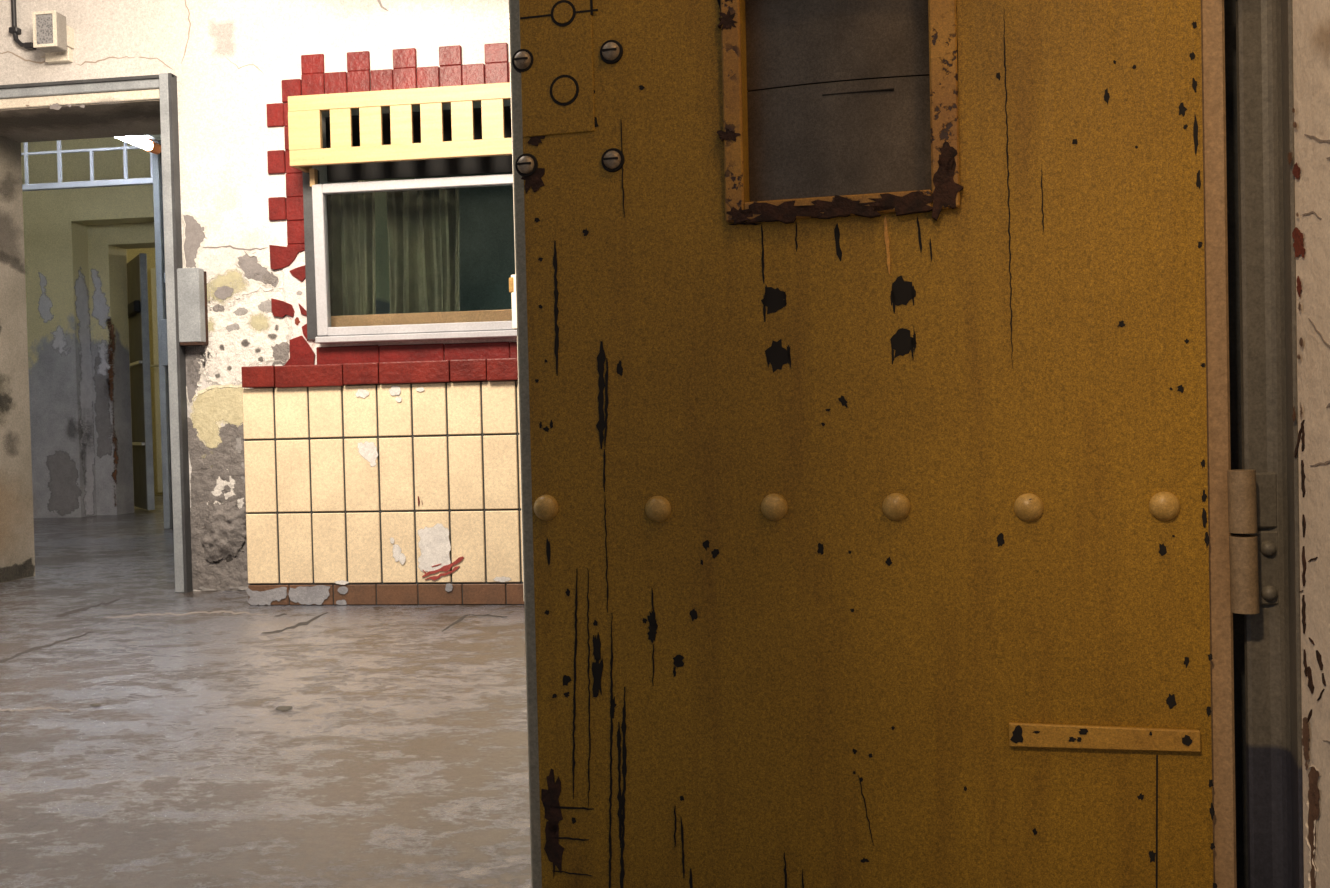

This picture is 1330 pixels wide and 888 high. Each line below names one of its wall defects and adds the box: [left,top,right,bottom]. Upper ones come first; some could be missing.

crack [0,51,45,64]
crack [77,0,191,69]
crack [1304,134,1330,160]
crack [1308,318,1330,348]
leakage [0,395,11,410]
spalling [181,211,349,605]
crack [0,599,328,663]
peeling [1301,717,1321,888]